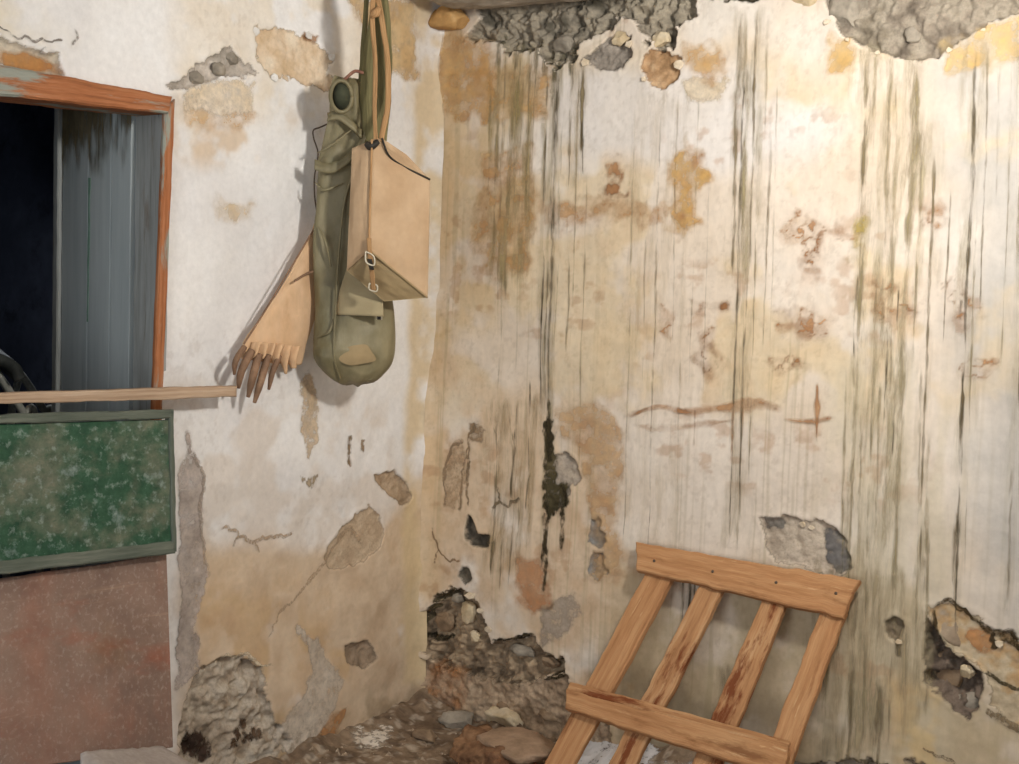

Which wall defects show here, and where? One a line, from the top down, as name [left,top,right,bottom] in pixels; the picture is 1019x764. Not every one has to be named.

peeling [167,27,335,92]
water stain [468,0,697,287]
spalling [581,36,684,90]
water stain [732,47,767,277]
spalling [792,0,1019,61]
water stain [906,78,935,242]
water stain [961,227,982,304]
water stain [495,262,569,591]
water stain [959,348,972,438]
spalling [175,433,344,764]
spalling [420,567,581,740]
peeling [923,602,1019,733]